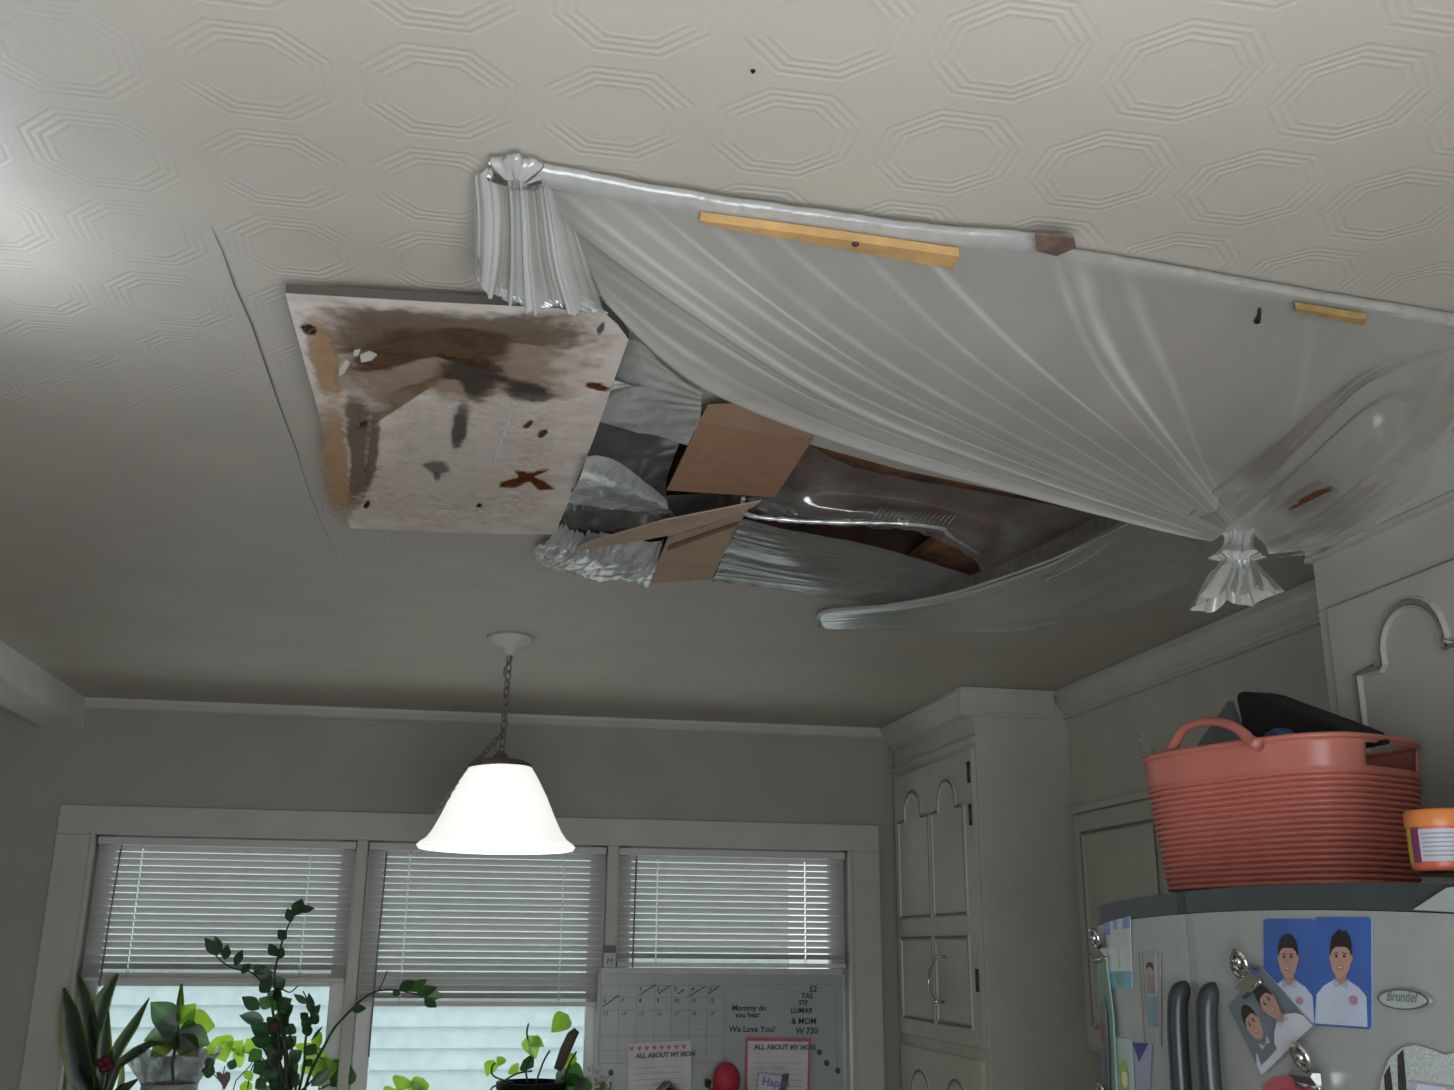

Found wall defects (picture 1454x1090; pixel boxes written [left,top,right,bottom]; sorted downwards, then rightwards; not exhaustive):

damp [309,309,577,513]